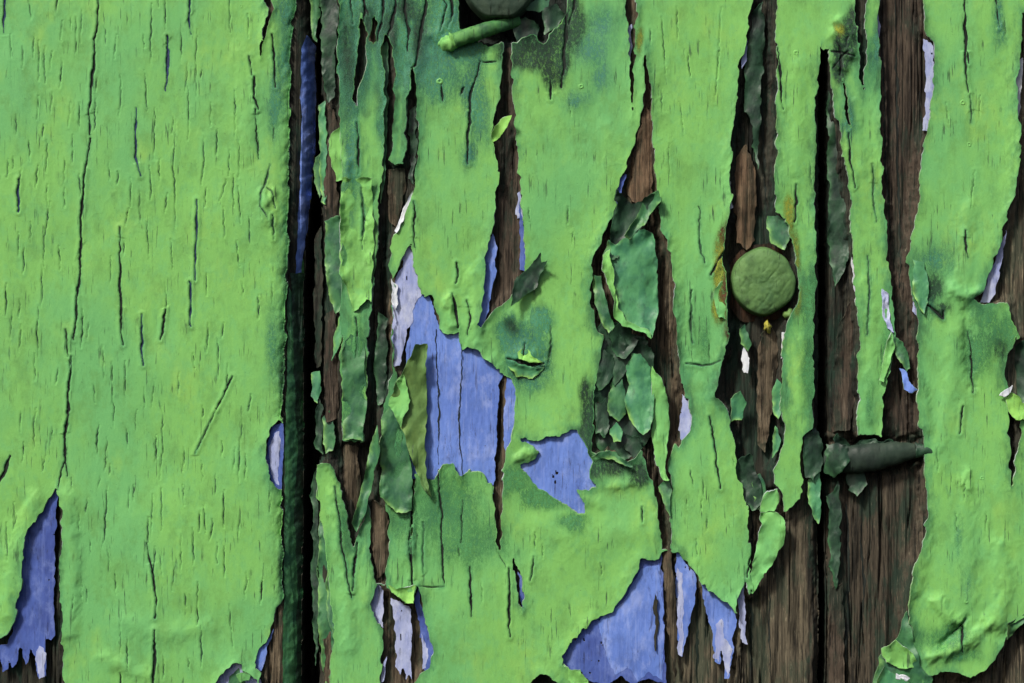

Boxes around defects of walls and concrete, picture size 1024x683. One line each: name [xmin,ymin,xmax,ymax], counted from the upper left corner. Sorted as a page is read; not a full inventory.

crack [963,0,980,118]
crack [0,0,276,683]
peeling [298,0,1024,683]
crack [926,305,944,319]
crack [959,331,973,434]
peeling [0,489,65,683]